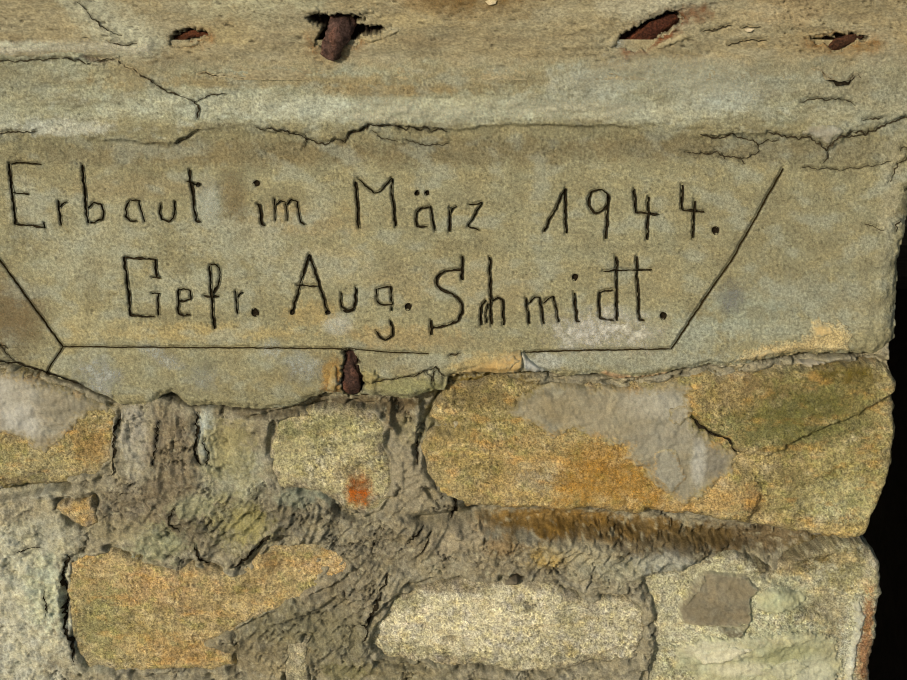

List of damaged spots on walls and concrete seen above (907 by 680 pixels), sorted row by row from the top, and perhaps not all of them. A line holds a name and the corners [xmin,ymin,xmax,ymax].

crack [0,2,244,144]
crack [691,417,741,453]